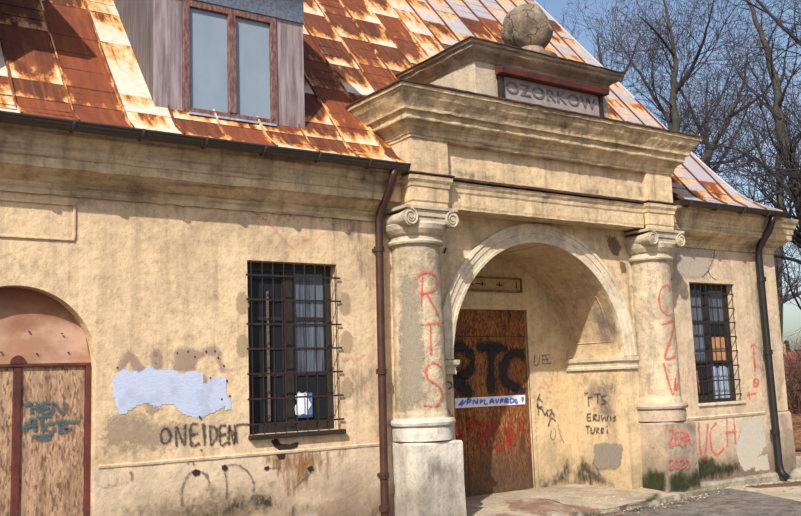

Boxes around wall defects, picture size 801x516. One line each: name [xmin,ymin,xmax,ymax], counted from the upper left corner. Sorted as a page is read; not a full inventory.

peeling [113,363,231,418]